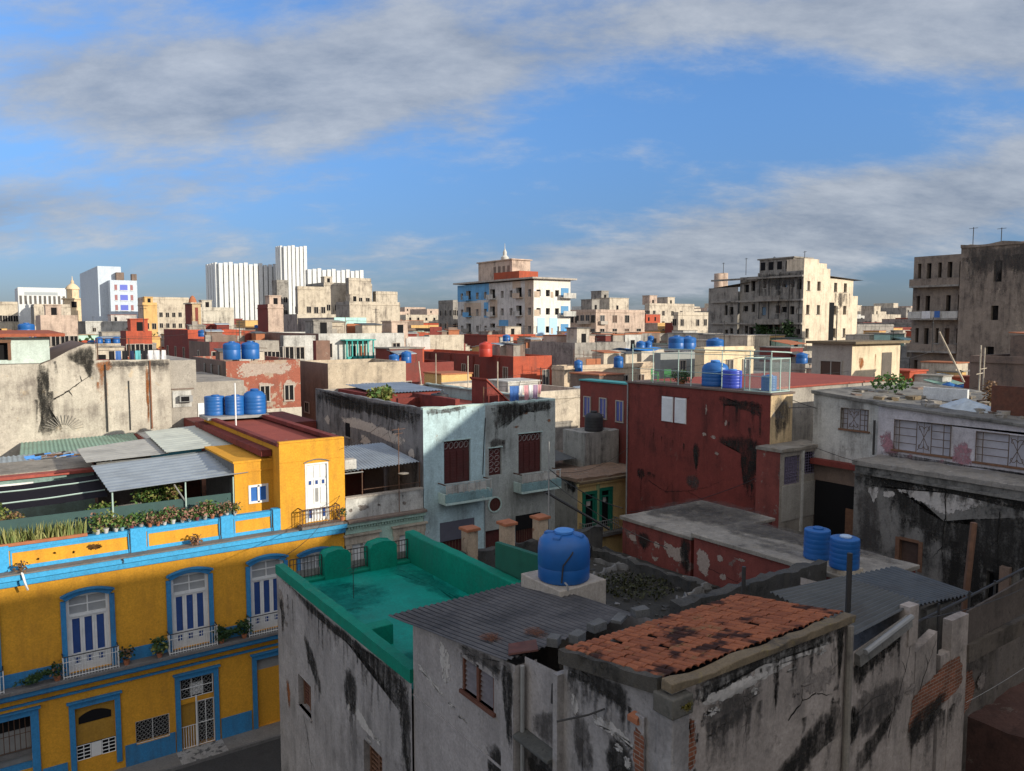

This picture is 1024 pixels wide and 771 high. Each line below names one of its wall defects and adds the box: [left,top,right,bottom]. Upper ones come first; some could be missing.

leakage [35,361,60,432]
leakage [68,347,94,376]
peeling [236,362,296,392]
leakage [490,400,550,447]
peeling [652,541,683,563]
peeling [696,549,745,580]
leakage [856,476,1024,607]
leakage [280,586,411,771]
crack [788,685,829,721]
flaking render [905,656,985,744]
peeling [592,710,646,771]
leakage [607,737,633,771]